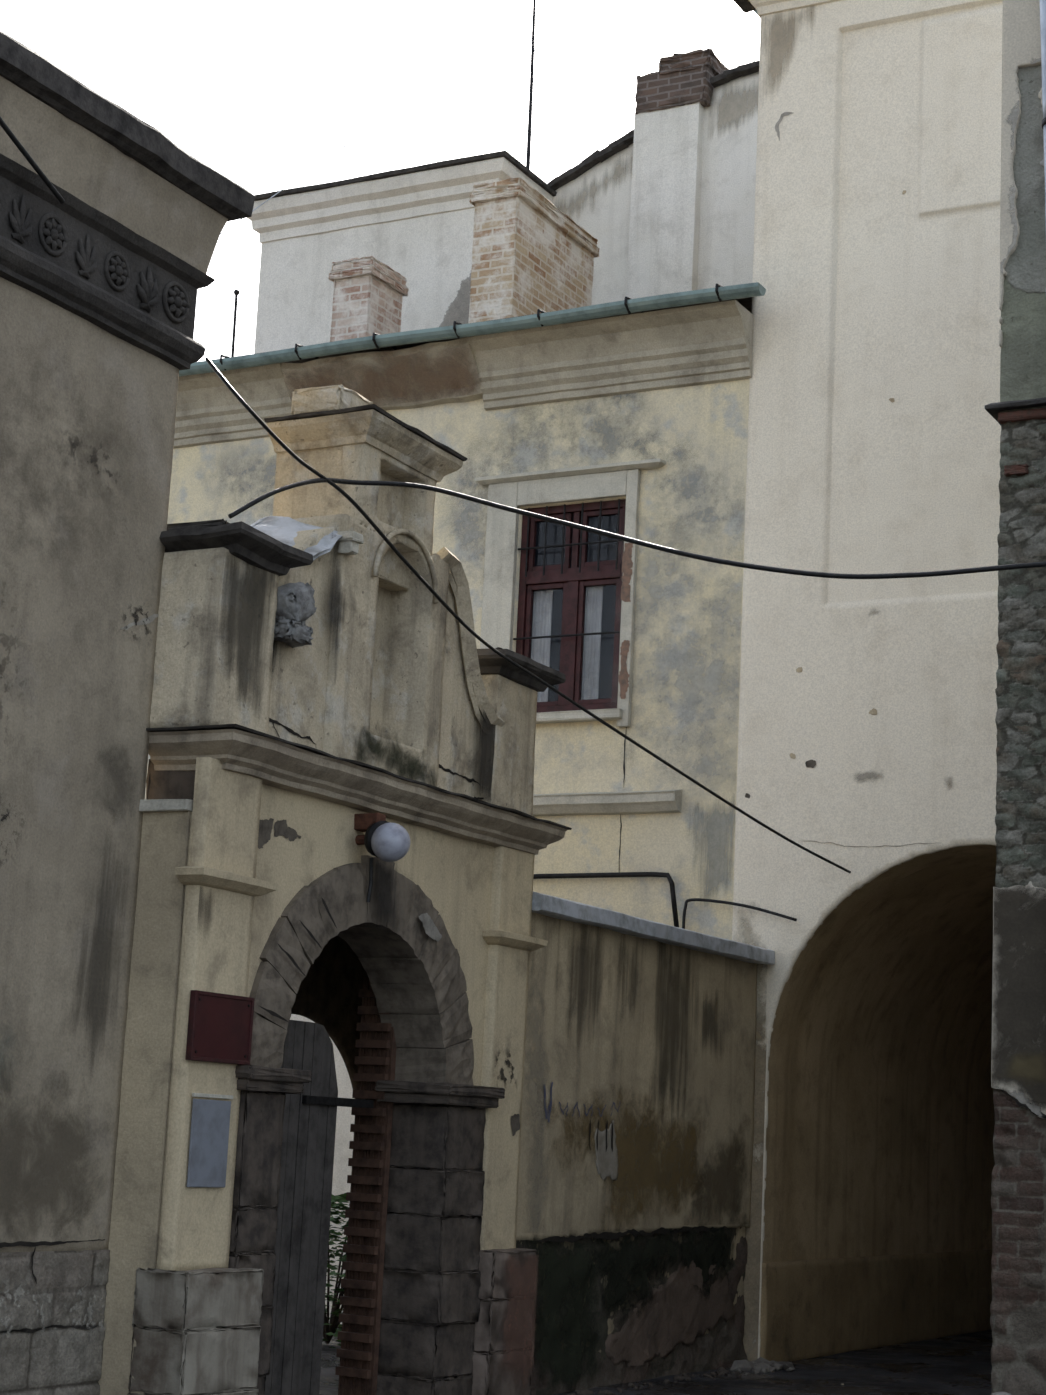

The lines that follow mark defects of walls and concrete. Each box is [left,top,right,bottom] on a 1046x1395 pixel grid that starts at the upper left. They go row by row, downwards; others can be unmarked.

flaking render [994,58,1046,891]
water stain [225,559,278,695]
water stain [330,543,342,648]
water stain [478,708,497,798]
flaking render [258,818,301,849]
water stain [694,806,733,896]
water stain [87,901,112,1040]
water stain [0,1115,89,1231]
water stain [561,932,767,1361]
flaking render [990,1087,1046,1395]
water stain [503,1255,538,1374]